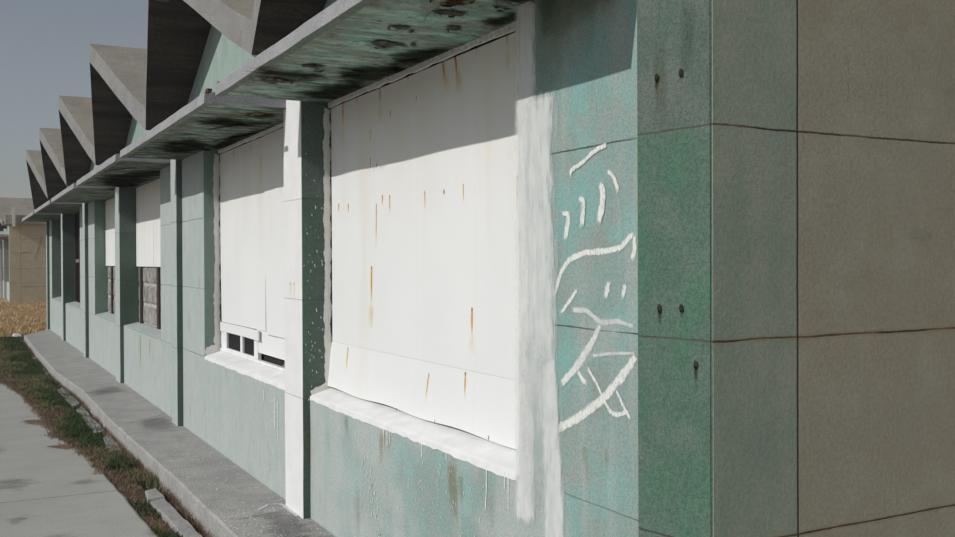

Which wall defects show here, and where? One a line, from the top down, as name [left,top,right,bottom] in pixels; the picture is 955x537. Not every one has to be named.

mould [481,0,523,26]
mould [249,47,449,99]
mould [146,117,281,154]